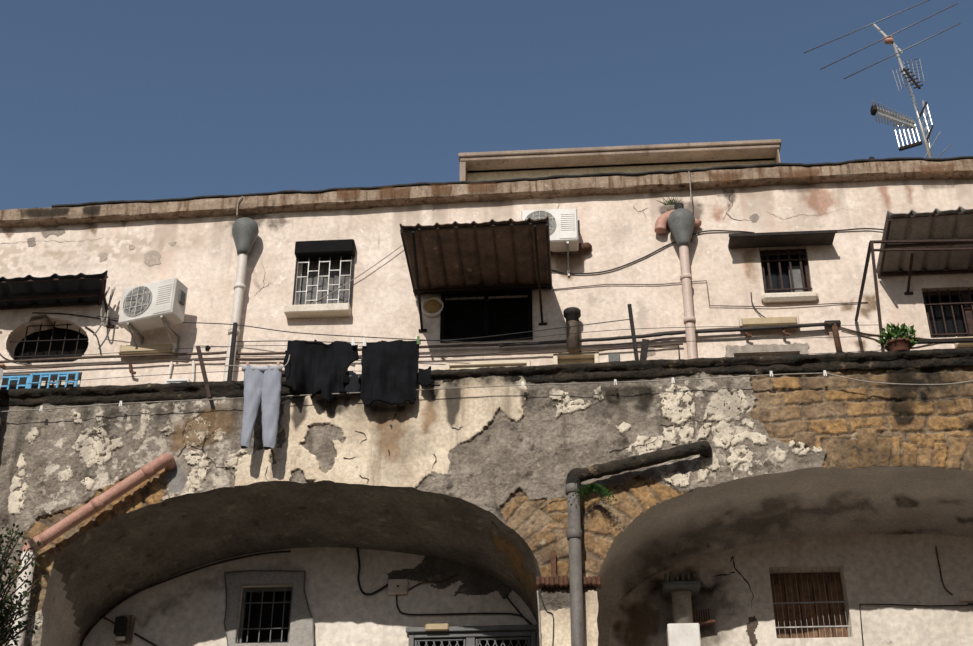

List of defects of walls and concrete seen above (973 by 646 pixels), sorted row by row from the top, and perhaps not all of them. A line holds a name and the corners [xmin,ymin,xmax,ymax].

flaking render [549,386,604,419]
leakage [888,367,914,424]
flaking render [8,427,39,515]
flaking render [13,409,151,578]
flaking render [29,417,227,616]
flaking render [268,429,286,464]
flaking render [289,422,346,483]
flaking render [416,475,437,492]
flaking render [499,489,570,592]
flaking render [580,366,973,583]
flaking render [387,556,512,599]
flaking render [746,616,758,646]